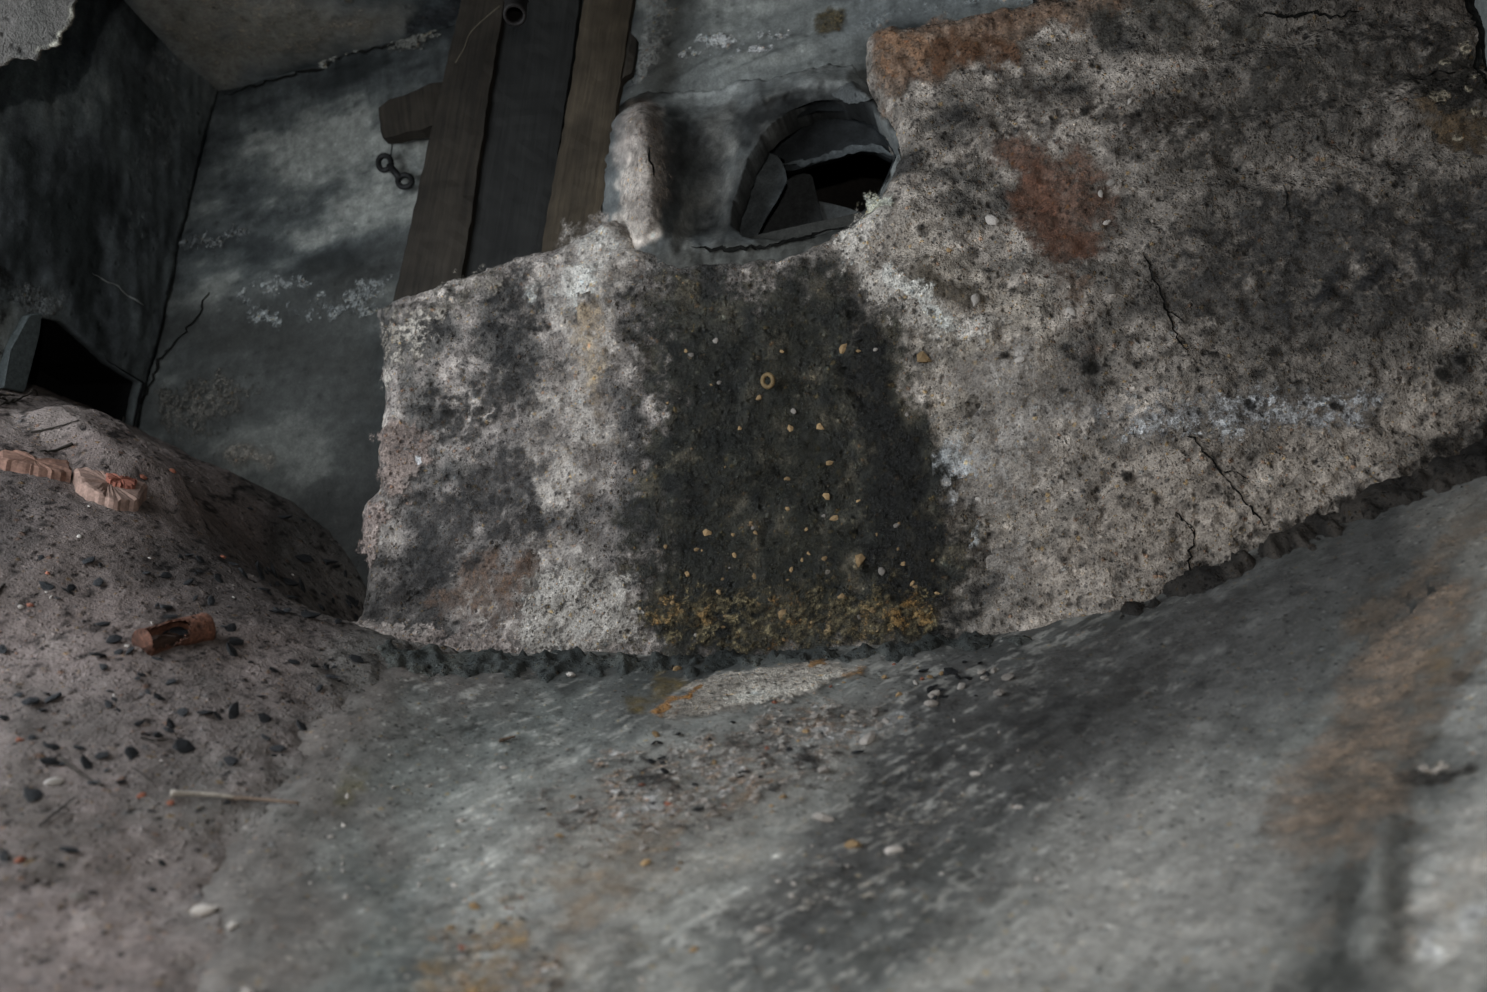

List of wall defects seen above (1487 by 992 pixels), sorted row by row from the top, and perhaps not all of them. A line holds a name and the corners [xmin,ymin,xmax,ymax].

crack [1405,0,1487,84]
corrosion [991,137,1119,262]
leakage [237,265,512,390]
leakage [352,191,1385,657]
crack [1181,419,1270,530]
crack [1176,512,1195,571]